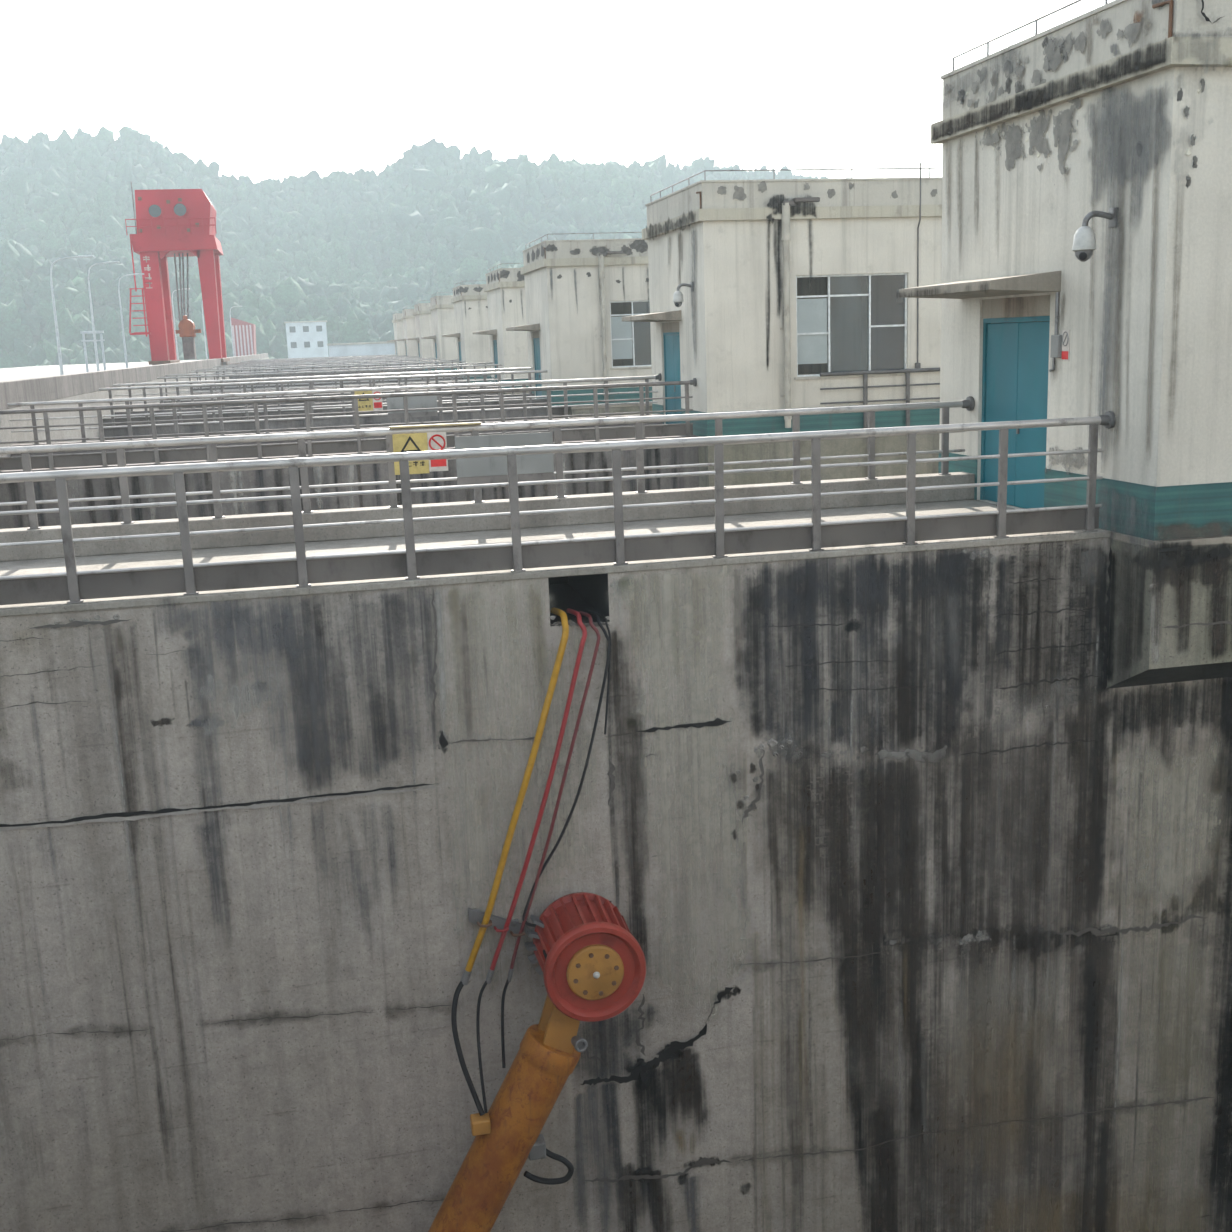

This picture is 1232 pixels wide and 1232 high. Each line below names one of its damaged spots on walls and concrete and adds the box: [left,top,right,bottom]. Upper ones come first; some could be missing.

peeling [945,12,1150,110]
peeling [717,181,767,200]
water stain [767,219,784,367]
water stain [1088,87,1164,462]
water stain [1099,490,1232,542]
water stain [112,644,141,911]
crack [0,783,438,831]
water stain [455,584,591,979]
crack [608,718,731,807]
water stain [607,573,746,1014]
water stain [721,554,1232,1232]
crack [581,952,890,1093]